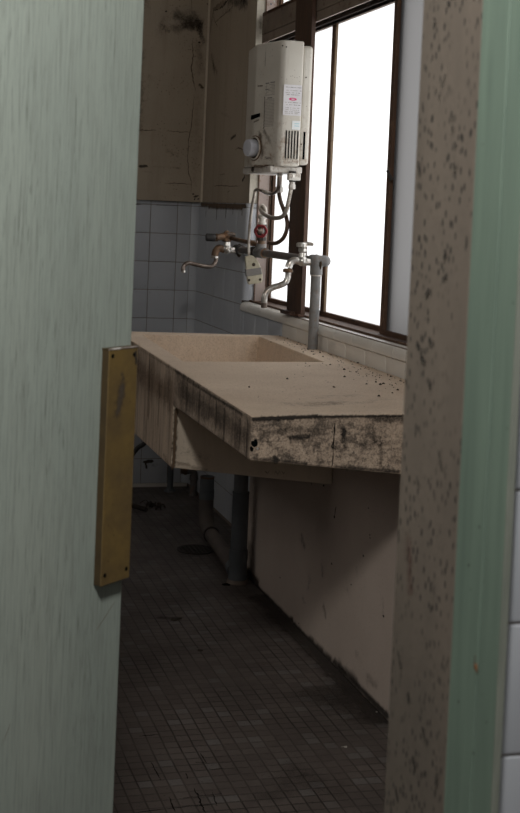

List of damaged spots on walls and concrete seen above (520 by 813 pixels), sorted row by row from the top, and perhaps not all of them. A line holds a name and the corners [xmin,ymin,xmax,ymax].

water stain [135,351,403,465]